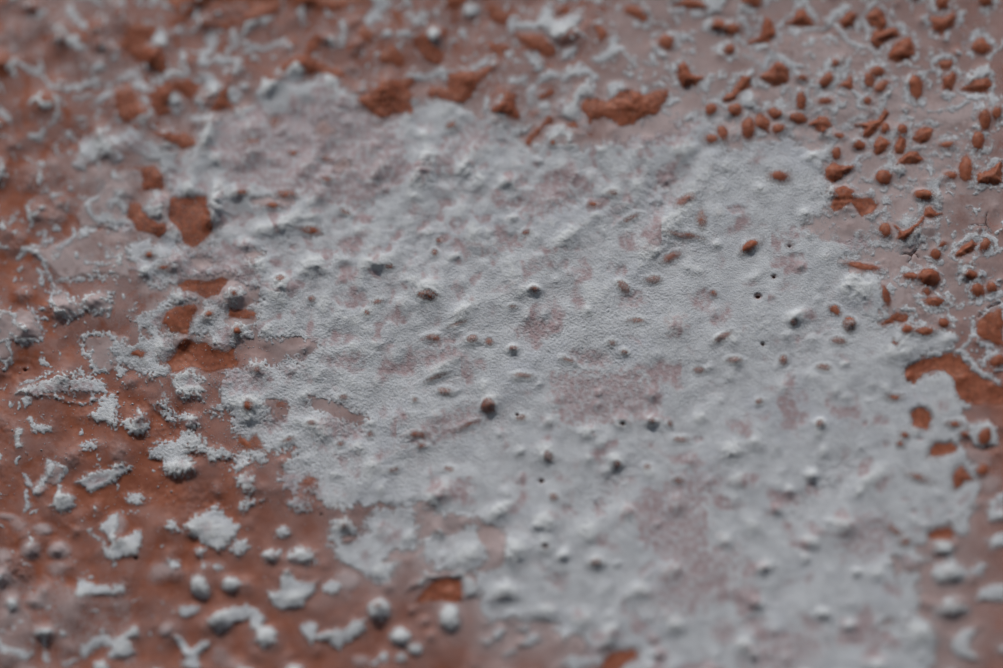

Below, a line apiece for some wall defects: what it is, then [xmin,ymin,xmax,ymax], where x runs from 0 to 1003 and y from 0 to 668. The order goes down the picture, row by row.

peeling [829,191,877,216]
peeling [168,196,213,247]
peeling [178,277,227,299]
peeling [167,339,238,373]
peeling [905,352,1003,405]
peeling [911,407,932,431]
peeling [930,442,957,456]
peeling [601,649,637,668]